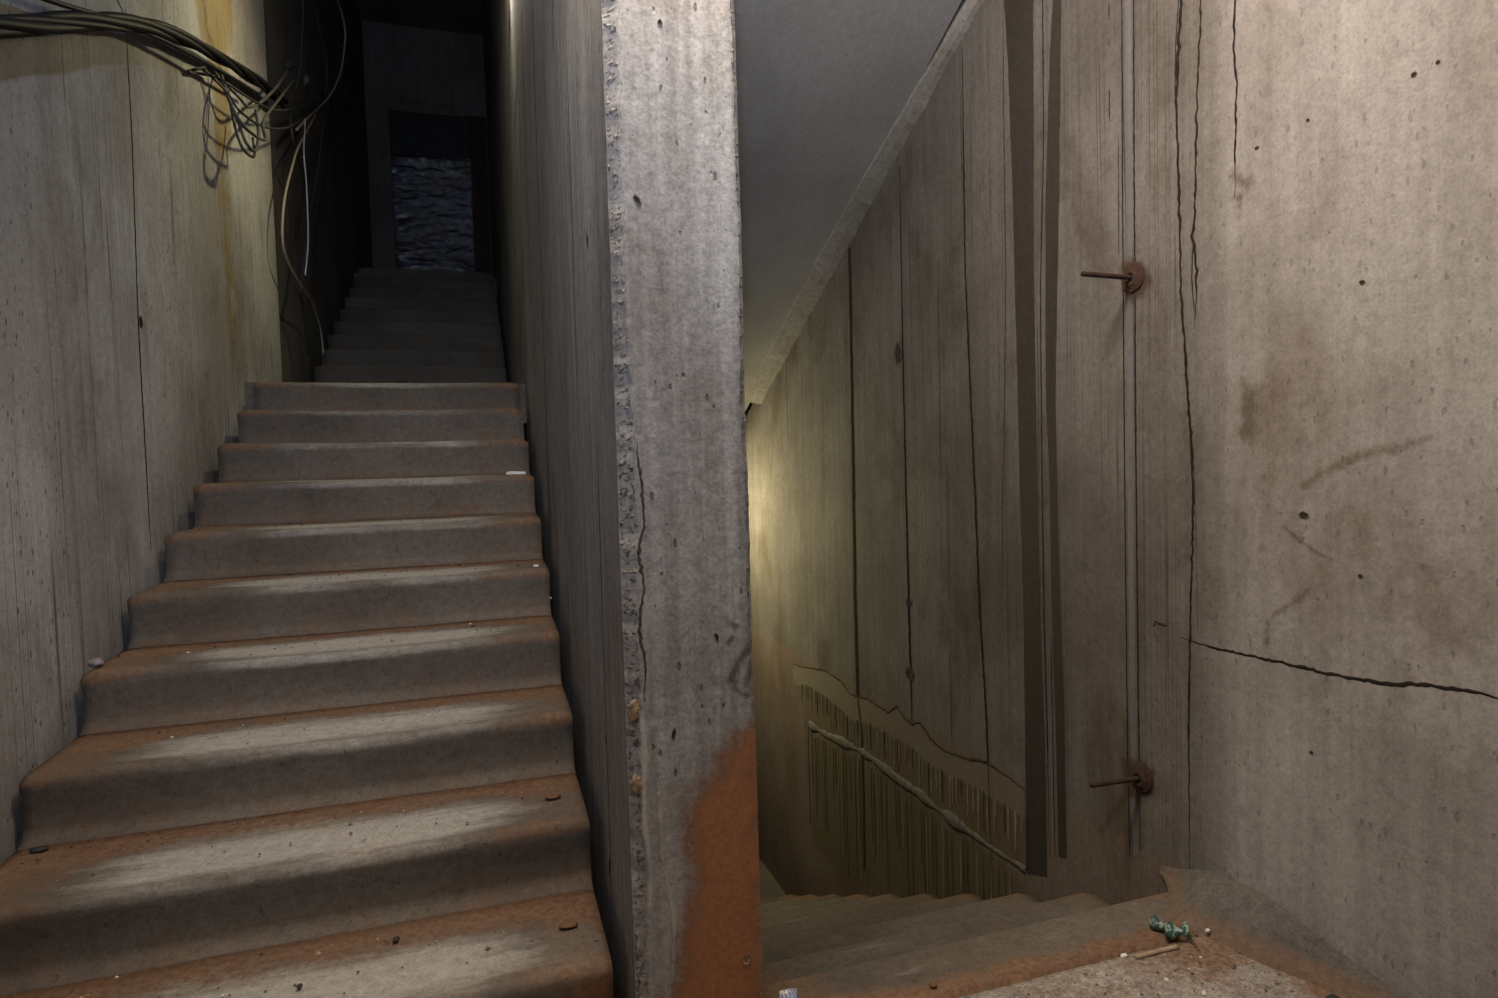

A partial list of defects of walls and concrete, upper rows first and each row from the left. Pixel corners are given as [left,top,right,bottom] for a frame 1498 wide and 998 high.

crack [515,0,647,935]
crack [1174,0,1498,869]